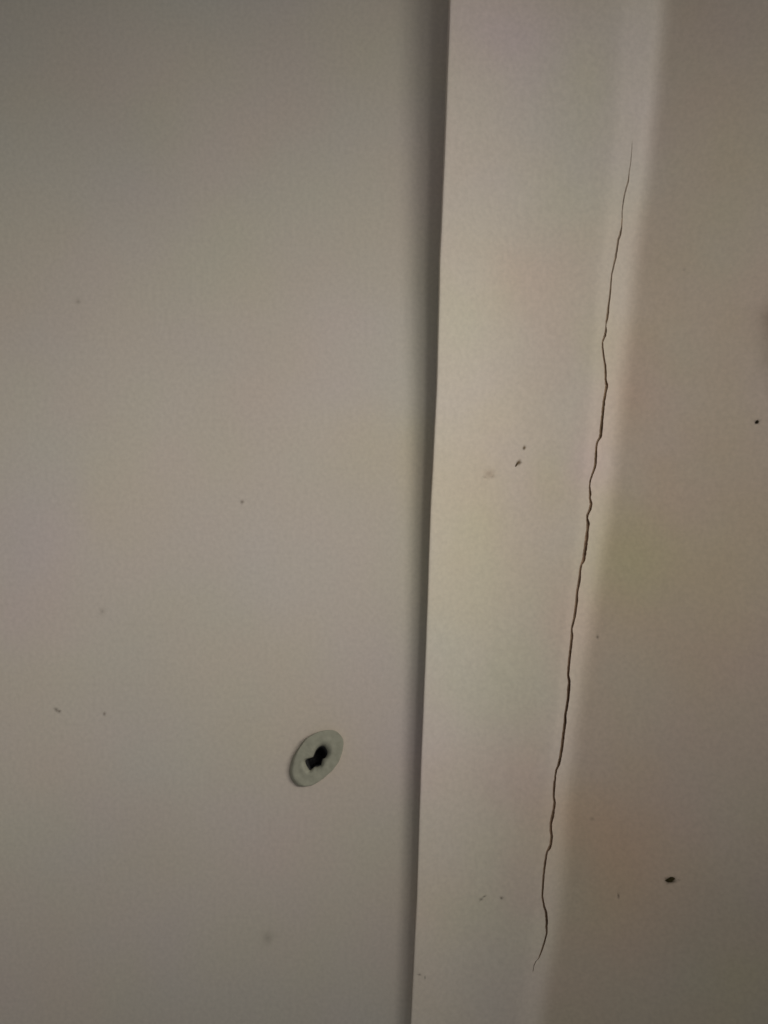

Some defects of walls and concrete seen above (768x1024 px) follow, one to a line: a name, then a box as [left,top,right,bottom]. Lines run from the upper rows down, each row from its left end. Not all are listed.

crack [533,151,632,970]